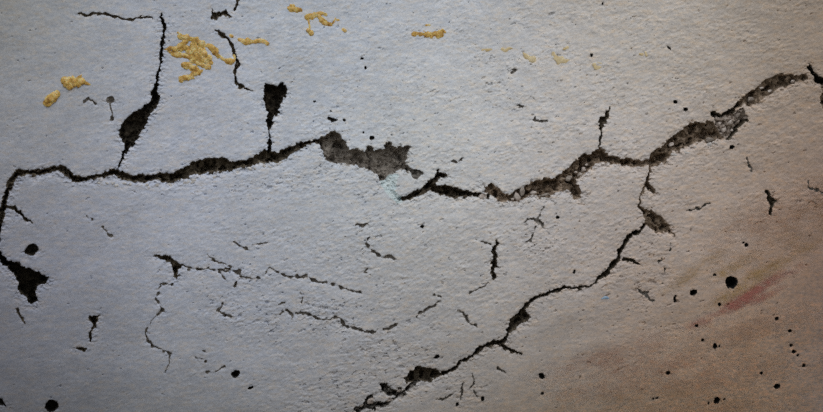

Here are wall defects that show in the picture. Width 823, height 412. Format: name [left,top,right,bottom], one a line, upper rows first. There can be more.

crack [76,315,100,352]
crack [0,0,320,324]
crack [145,73,808,412]
crack [807,180,823,194]